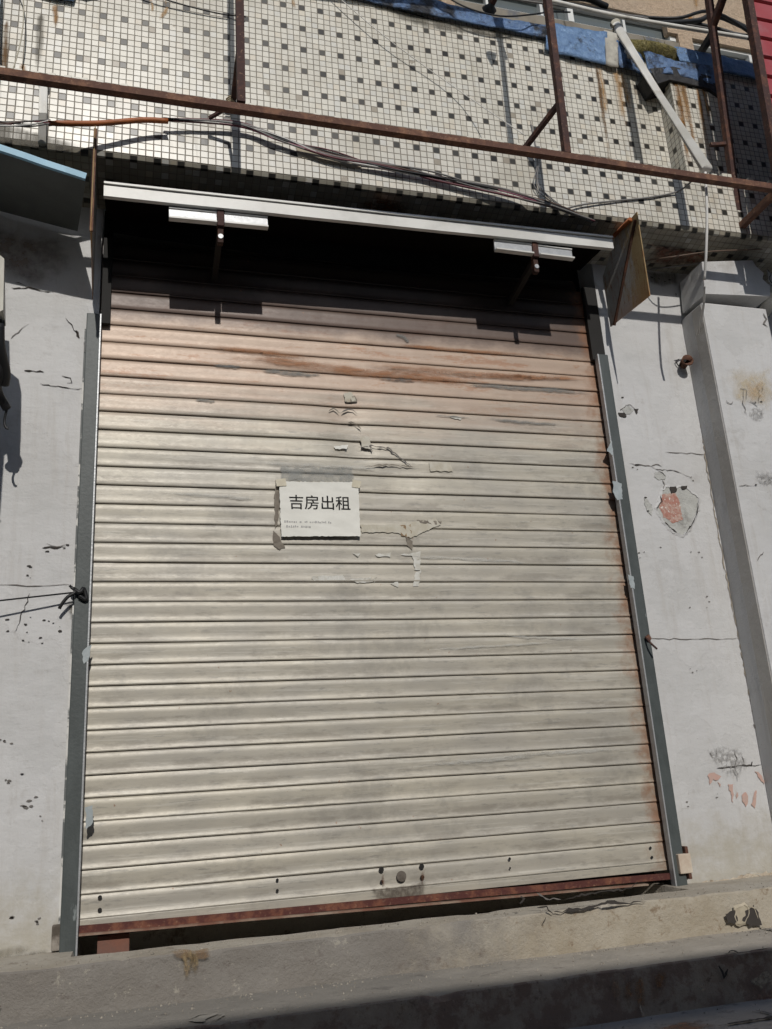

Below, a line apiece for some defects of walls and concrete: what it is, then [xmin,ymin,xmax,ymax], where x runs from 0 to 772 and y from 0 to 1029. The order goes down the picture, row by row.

rust [596,69,606,132]
rust [677,86,709,153]
spalling [644,471,701,538]
crack [710,750,761,781]
peeling [708,749,765,808]
crack [519,882,647,923]